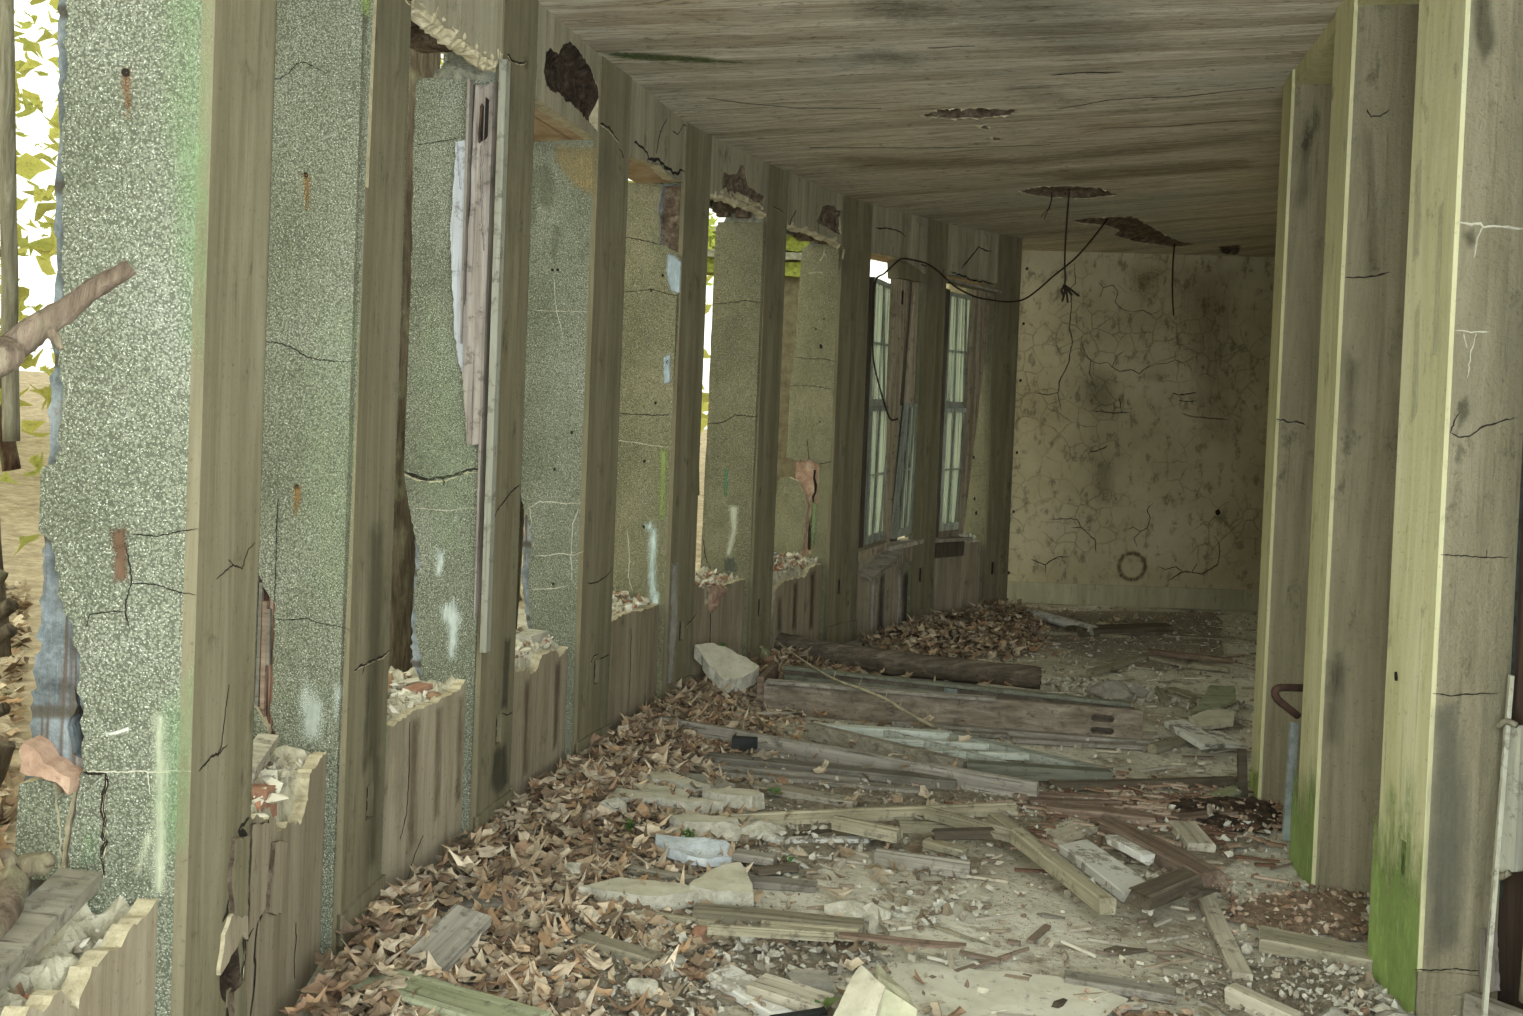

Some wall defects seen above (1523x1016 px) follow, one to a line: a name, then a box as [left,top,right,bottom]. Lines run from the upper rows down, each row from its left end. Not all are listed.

spalling [544,41,599,130]
spalling [918,107,1018,143]
spalling [709,164,766,219]
spalling [787,205,841,249]
spalling [1018,186,1116,200]
spalling [1071,216,1195,247]
crack [1038,268,1228,453]
crack [1277,418,1305,426]
crack [1450,330,1515,438]
crack [1032,505,1221,581]
spalling [255,576,272,717]
crack [83,688,229,878]